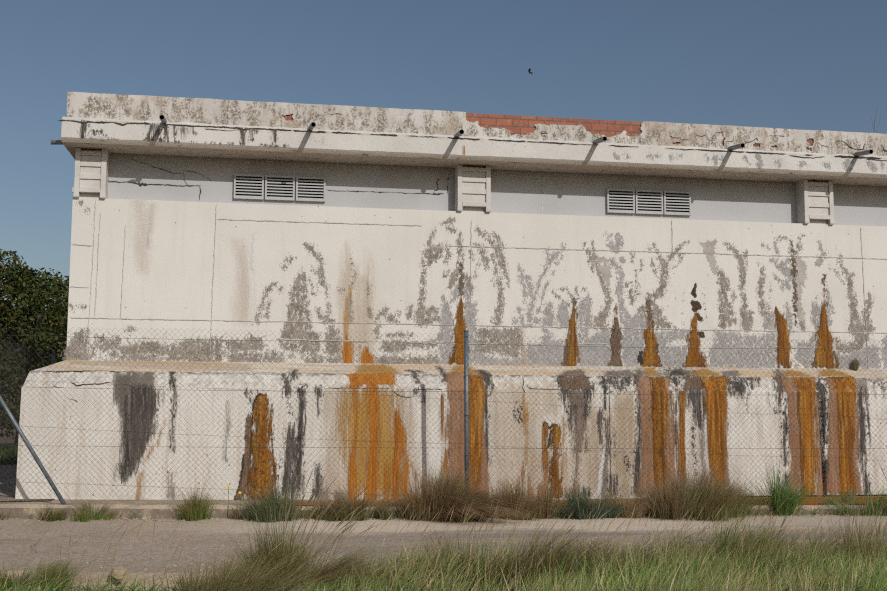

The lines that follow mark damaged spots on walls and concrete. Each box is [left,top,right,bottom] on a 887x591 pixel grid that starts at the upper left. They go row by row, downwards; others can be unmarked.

crack [108,159,210,201]
spalling [466,113,642,137]
damp [113,371,178,484]
corrosion [234,387,336,505]
damp [277,369,340,500]
corrosion [337,259,423,506]
corrosion [441,262,495,497]
corrosion [561,297,580,366]
damp [557,303,636,499]
corrosion [617,300,686,505]
corrosion [681,283,730,487]
corrosion [746,274,887,505]